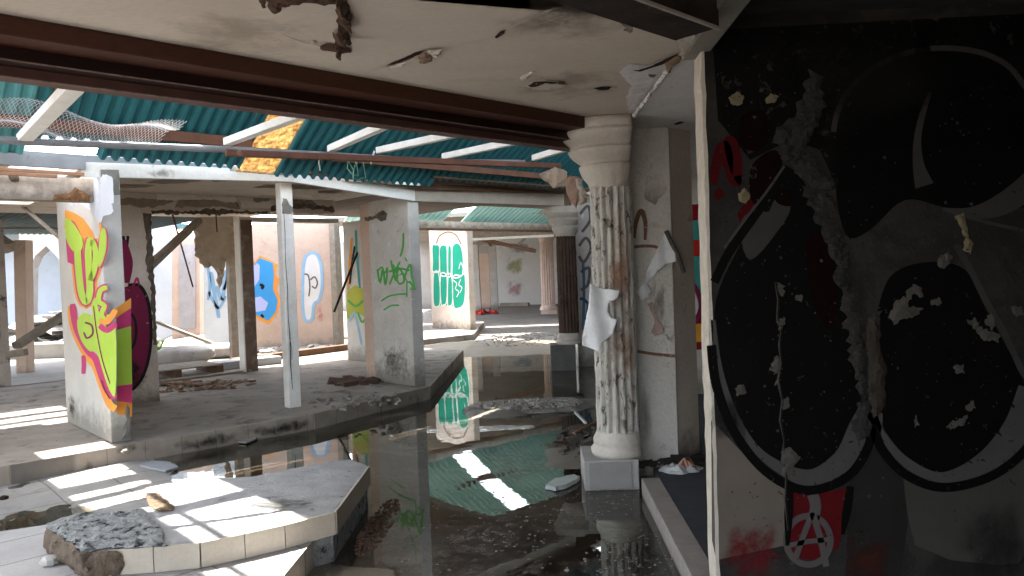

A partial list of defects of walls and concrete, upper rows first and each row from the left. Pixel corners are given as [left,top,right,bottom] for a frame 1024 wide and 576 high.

peeling [52,169,368,345]
peeling [861,277,942,325]
peeling [967,312,1001,343]
peeling [946,401,975,430]